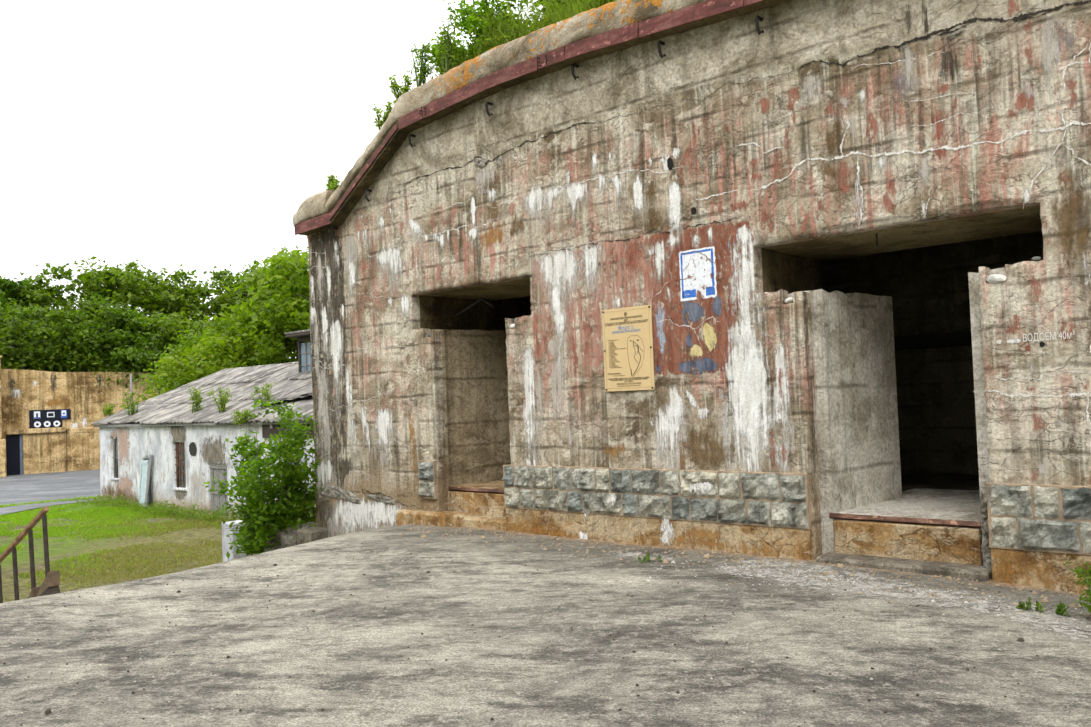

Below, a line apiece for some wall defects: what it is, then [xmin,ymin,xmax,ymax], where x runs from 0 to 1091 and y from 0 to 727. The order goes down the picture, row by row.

spalling [476,155,505,173]
crack [364,40,1091,345]
crack [388,0,1091,193]
peeling [532,200,774,379]
peeling [686,390,709,420]
crack [973,345,1091,451]